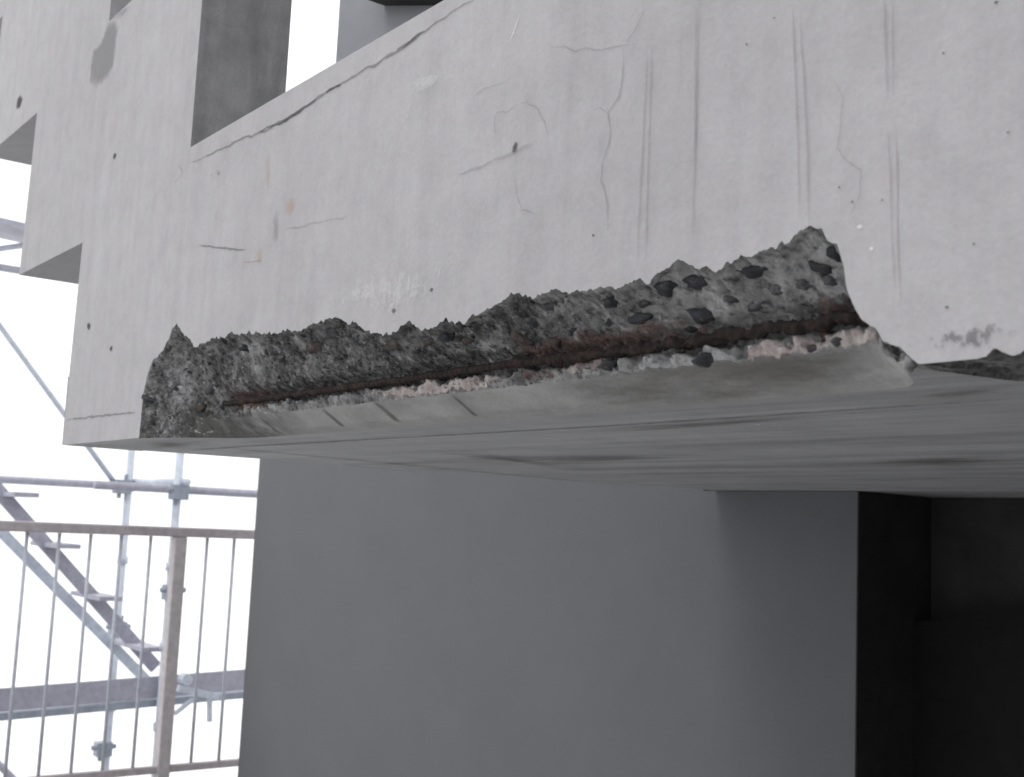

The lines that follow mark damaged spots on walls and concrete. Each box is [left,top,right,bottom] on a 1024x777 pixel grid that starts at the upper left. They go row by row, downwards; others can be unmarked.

spalling [139,226,1024,438]